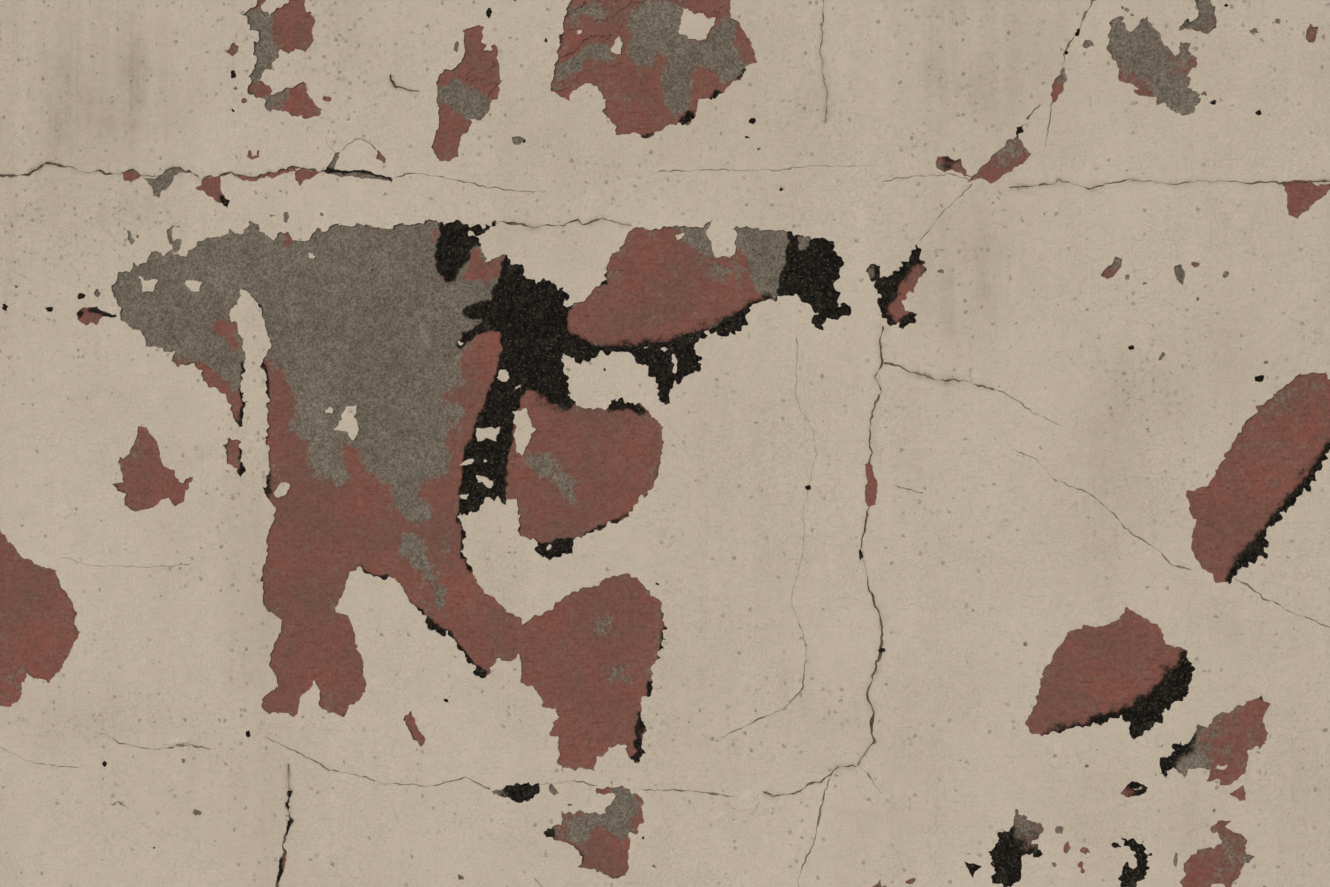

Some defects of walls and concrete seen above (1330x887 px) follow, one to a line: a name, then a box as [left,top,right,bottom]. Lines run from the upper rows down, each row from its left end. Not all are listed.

peeling [544,0,757,138]
crack [1027,0,1095,147]
crack [0,139,632,228]
crack [1010,180,1330,190]
peeling [77,212,851,771]
crack [1013,449,1191,570]
peeling [1186,373,1330,584]
peeling [0,531,80,707]
crack [763,326,1058,887]
peeling [1025,607,1195,740]
crack [538,780,596,795]
peeling [964,809,1090,887]